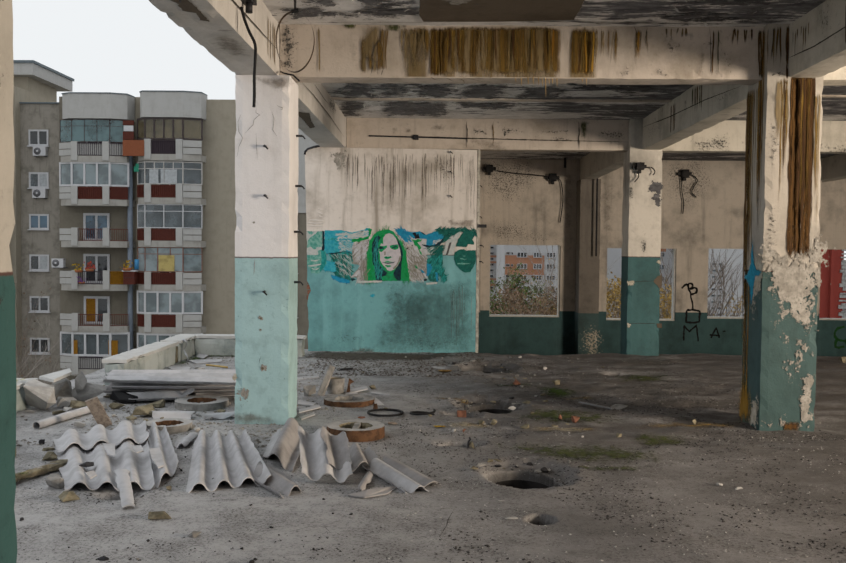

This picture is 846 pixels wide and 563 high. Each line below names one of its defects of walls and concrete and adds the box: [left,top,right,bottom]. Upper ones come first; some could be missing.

spalling [170,0,210,22]
spalling [278,0,585,22]
corrosion [361,28,388,80]
corrosion [400,28,560,83]
corrosion [570,28,617,78]
peeling [333,83,652,118]
spalling [648,180,664,207]
corrosion [732,24,821,420]
peeling [748,233,846,431]